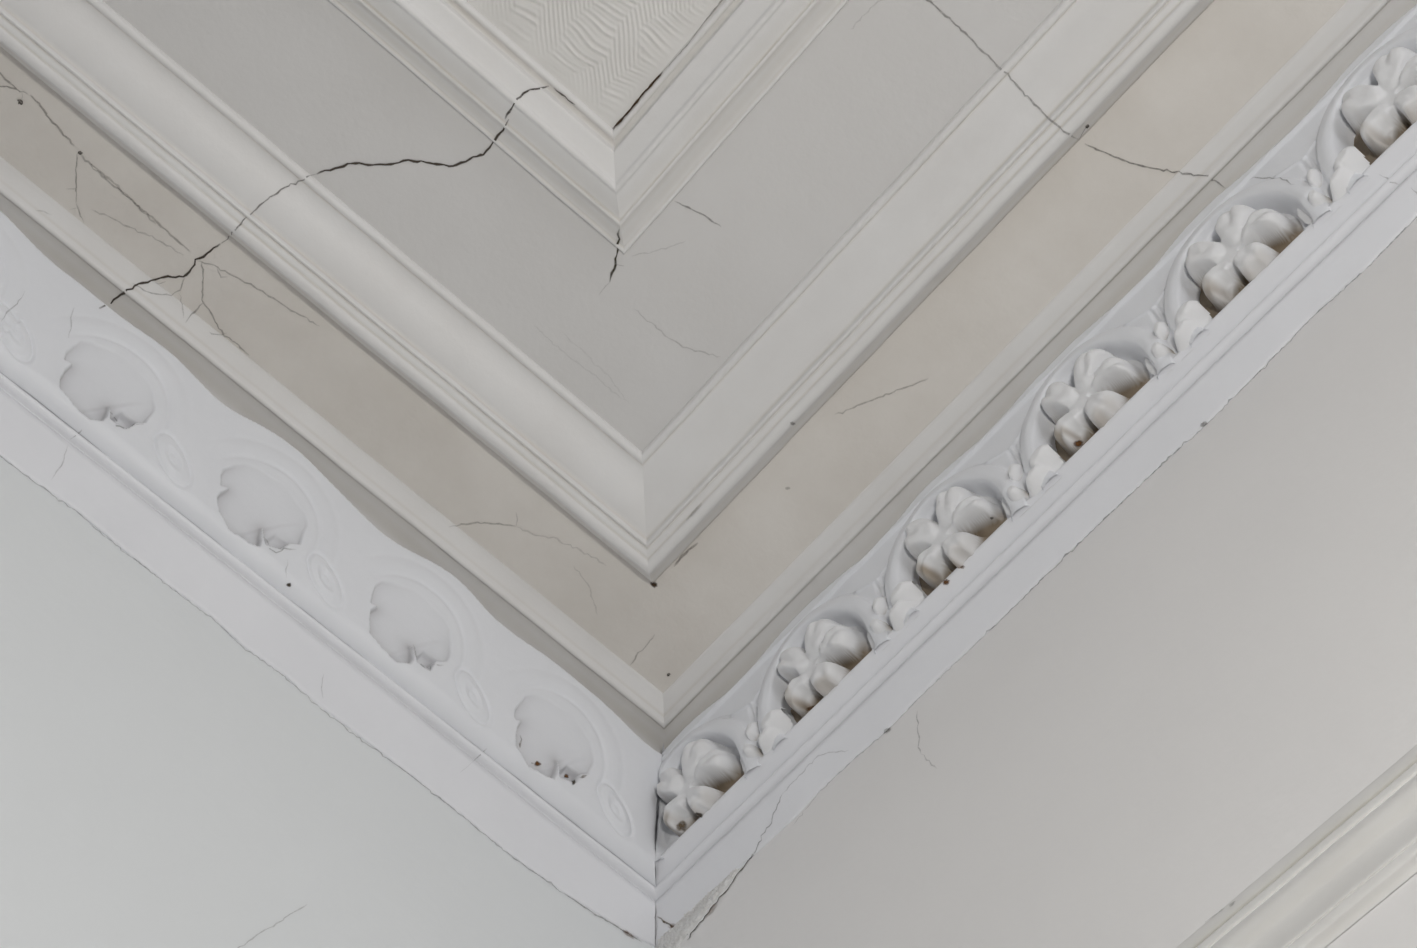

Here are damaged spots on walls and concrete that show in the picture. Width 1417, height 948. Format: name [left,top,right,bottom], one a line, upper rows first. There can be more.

crack [613,73,662,128]
crack [102,86,574,307]
crack [610,233,620,280]
crack [689,856,752,938]